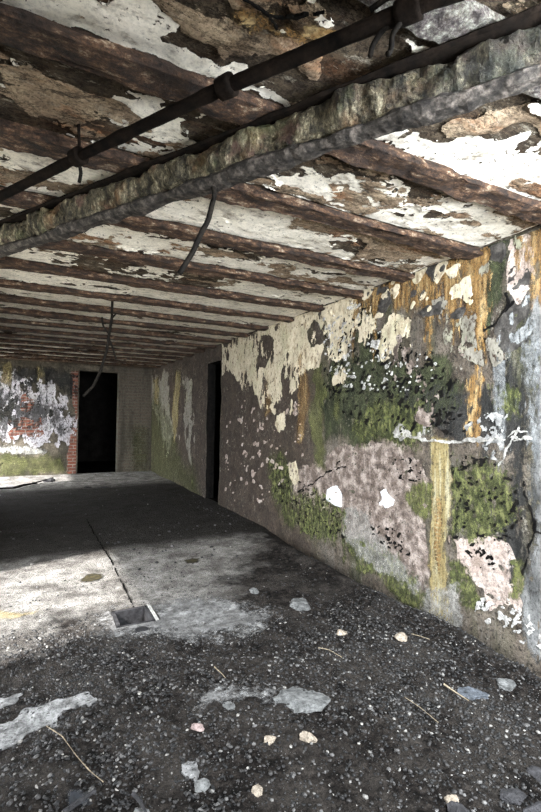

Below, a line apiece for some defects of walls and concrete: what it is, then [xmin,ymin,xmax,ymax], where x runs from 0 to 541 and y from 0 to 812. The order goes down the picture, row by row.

peeling [0,0,248,78]
rust [233,6,334,46]
peeling [406,39,429,53]
peeling [0,148,57,187]
spalling [0,51,175,143]
peeling [118,117,196,159]
peeling [241,85,302,107]
peeling [376,130,541,201]
peeling [528,100,541,116]
peeling [0,155,539,596]
mould [271,466,346,539]
water stain [319,288,541,661]